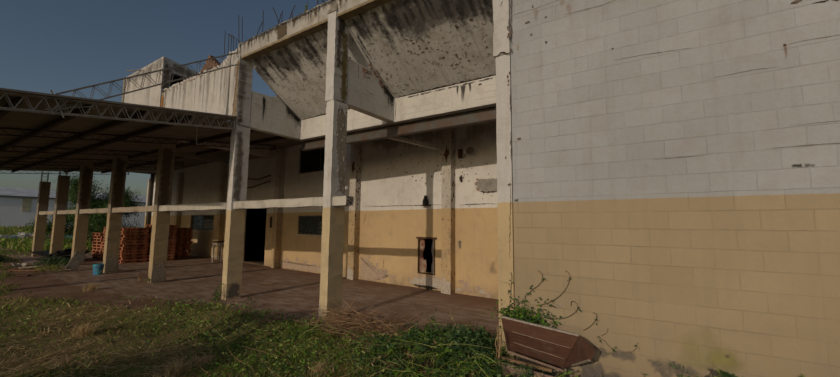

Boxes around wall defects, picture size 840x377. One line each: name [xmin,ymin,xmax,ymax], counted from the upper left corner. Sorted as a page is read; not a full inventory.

water stain [239,0,341,82]
water stain [337,0,493,100]
peeling [333,104,395,281]
flaking render [404,130,497,221]
peeling [407,274,491,298]